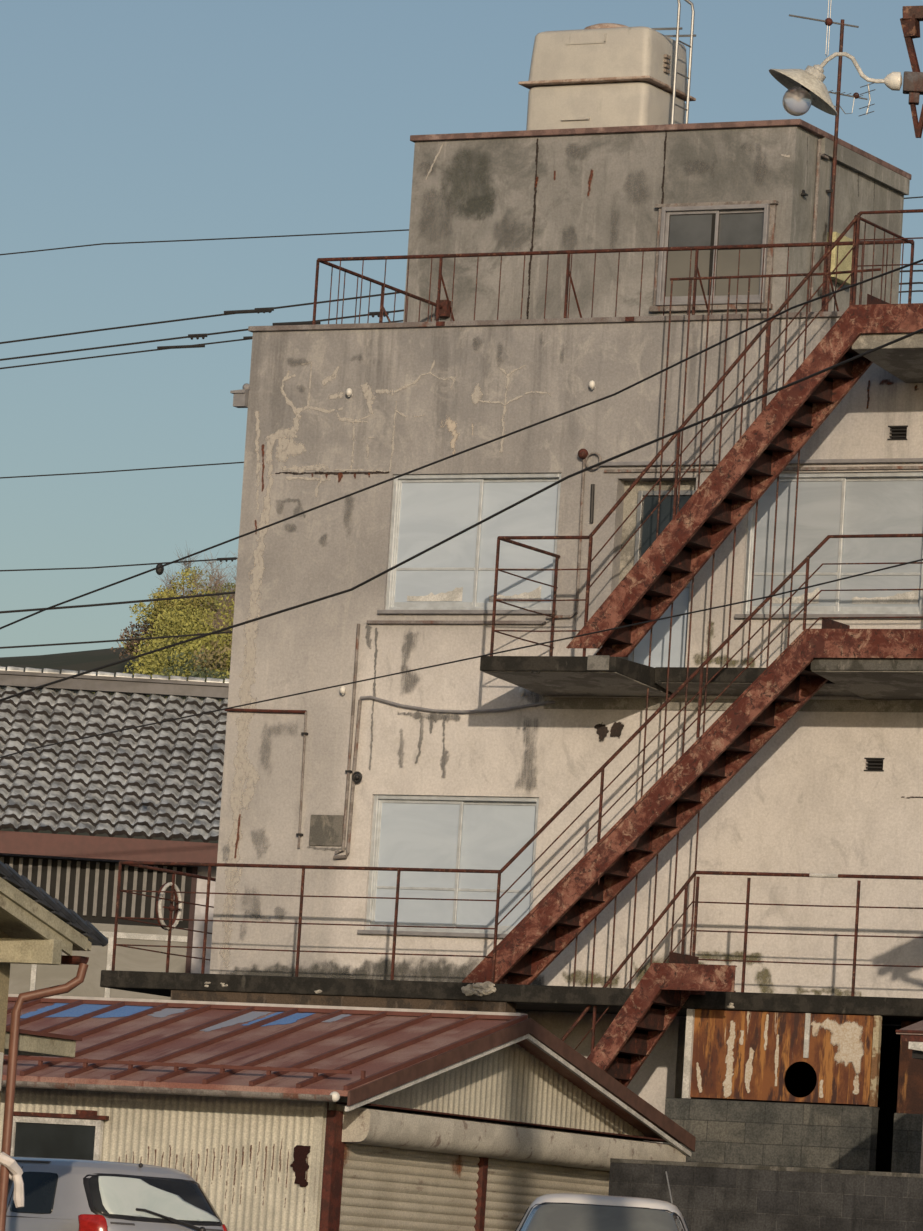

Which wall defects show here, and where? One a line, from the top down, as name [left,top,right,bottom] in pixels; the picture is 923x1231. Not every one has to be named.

water stain [426,142,495,217]
crack [265,360,550,497]
water stain [401,633,418,692]
water stain [366,624,378,770]
water stain [398,711,460,778]
water stain [230,959,472,982]
water stain [699,951,761,964]